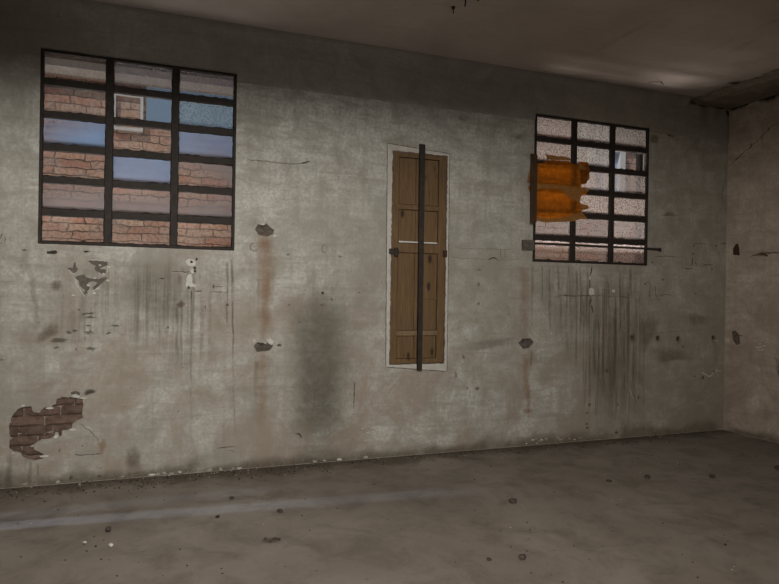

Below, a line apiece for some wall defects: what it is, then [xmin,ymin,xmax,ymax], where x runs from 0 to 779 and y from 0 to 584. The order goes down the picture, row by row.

spalling [254,221,276,237]
peeling [67,251,110,297]
spalling [253,338,281,356]
spalling [519,337,537,349]
spalling [4,390,100,463]